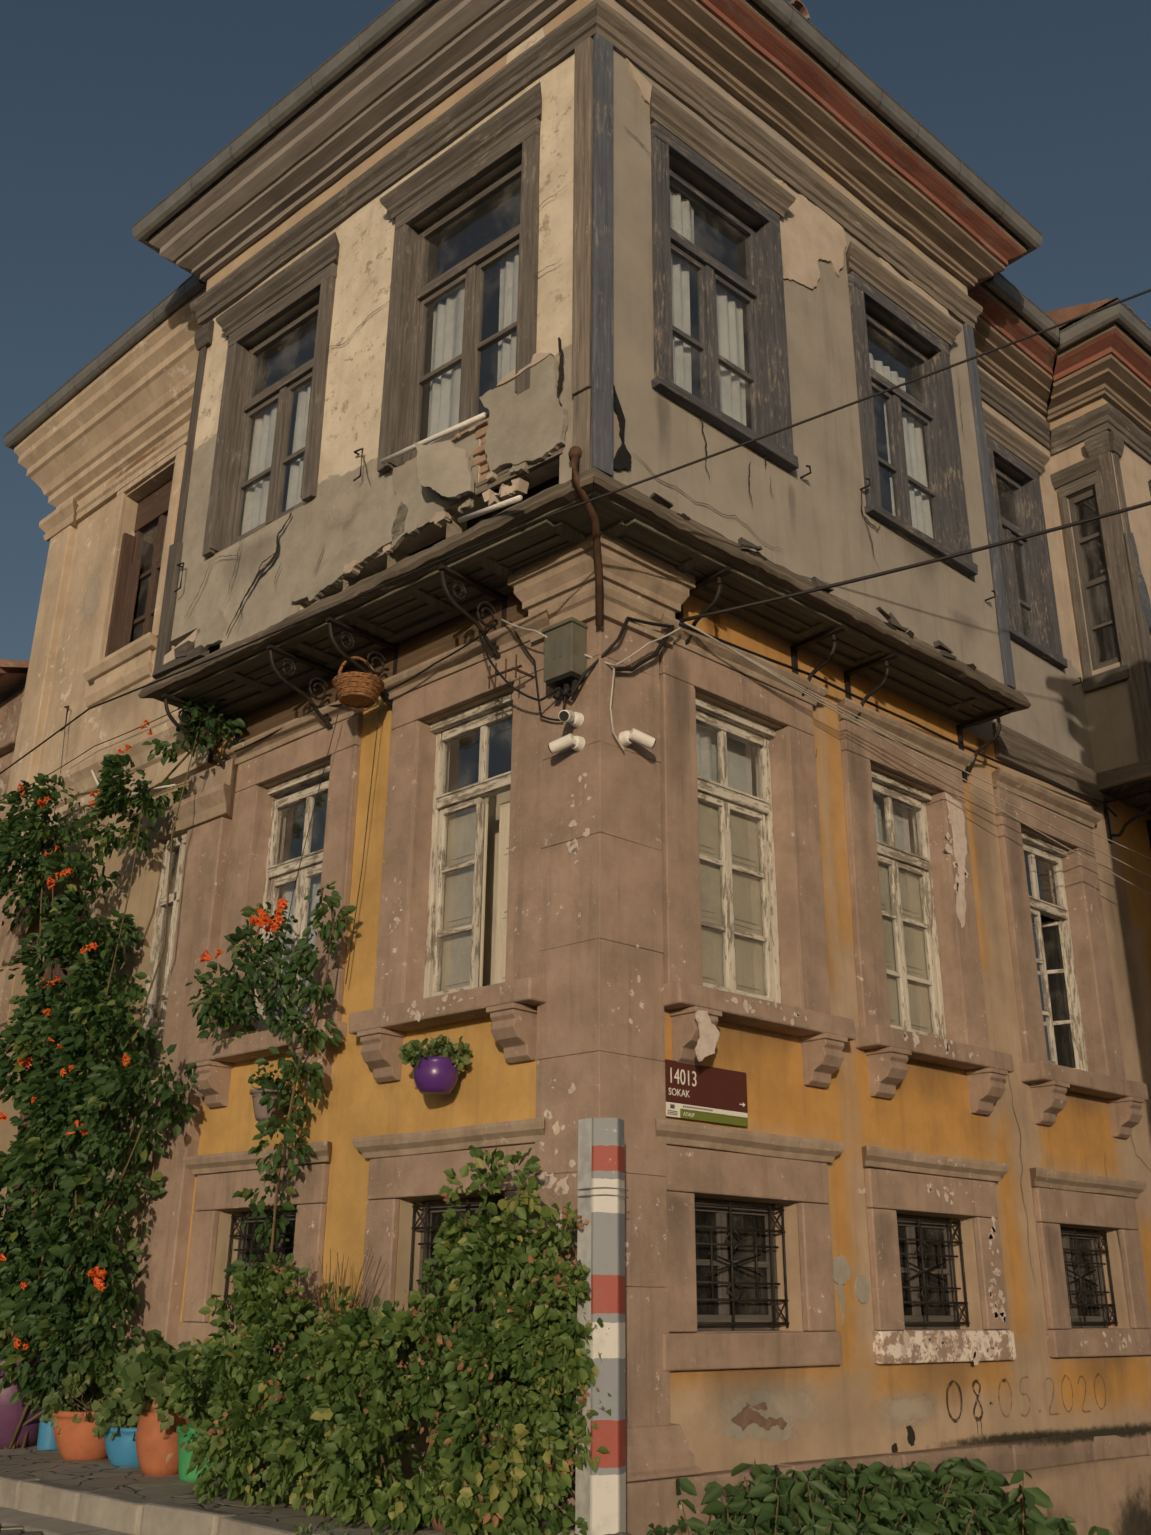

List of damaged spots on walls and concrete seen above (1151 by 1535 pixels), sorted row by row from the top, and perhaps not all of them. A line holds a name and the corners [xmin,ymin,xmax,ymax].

spalling [290,352,568,603]
crack [184,513,324,635]
peeling [927,1183,974,1205]
peeling [988,1216,1006,1323]
peeling [901,1330,1009,1365]
spalling [724,1388,792,1442]